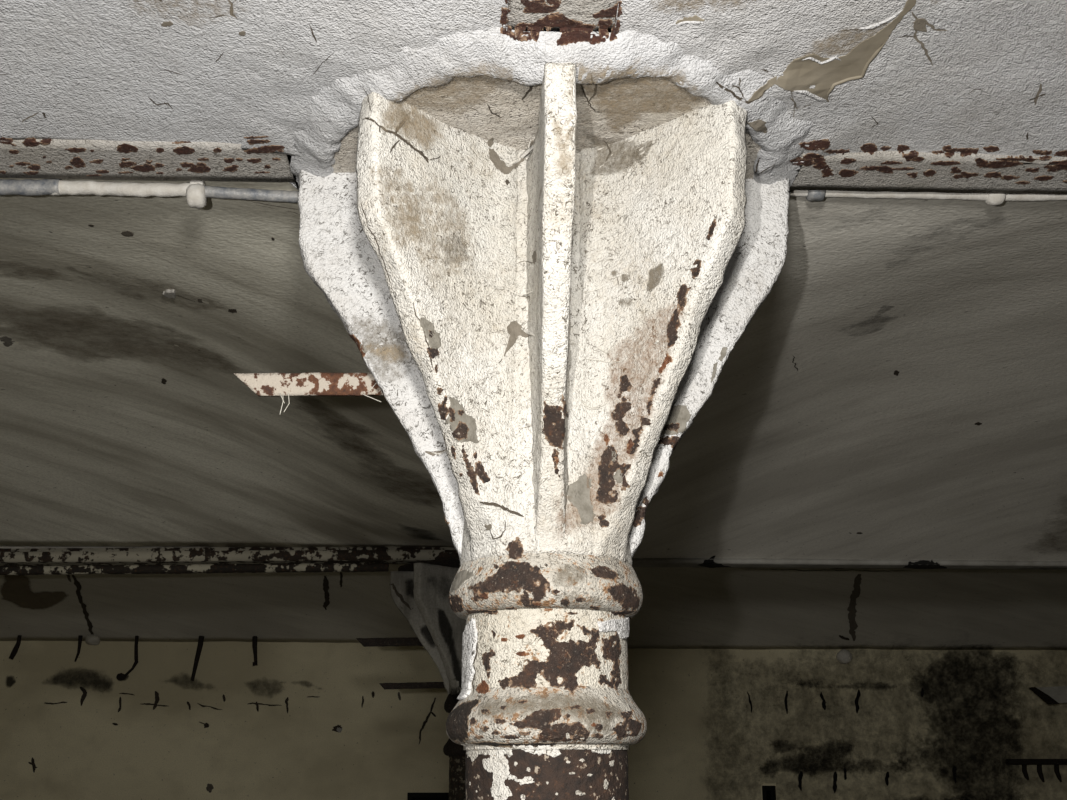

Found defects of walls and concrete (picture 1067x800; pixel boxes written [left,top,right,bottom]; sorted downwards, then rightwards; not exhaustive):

rust [500,0,623,46]
flaking render [668,0,705,26]
flaking render [748,0,948,109]
rust [0,137,52,175]
rust [65,136,285,176]
crack [362,87,440,163]
rust [790,139,1067,185]
rust [595,259,702,528]
rust [438,395,490,495]
rust [446,537,641,748]